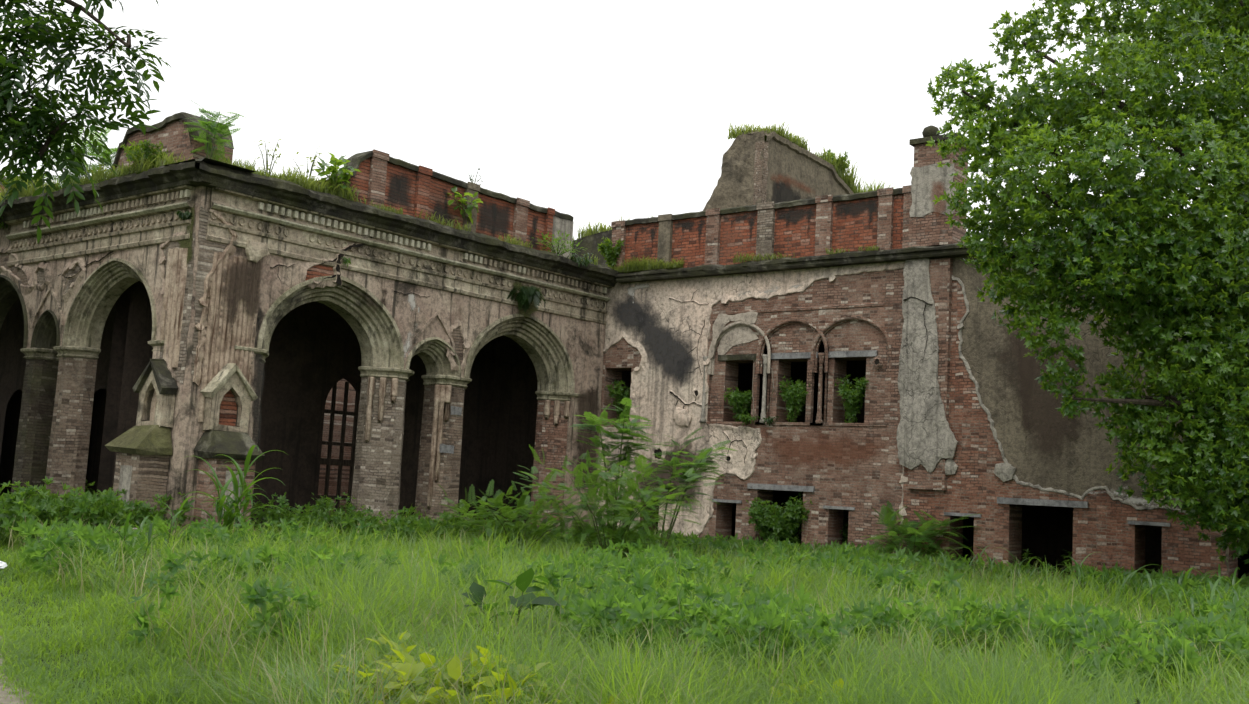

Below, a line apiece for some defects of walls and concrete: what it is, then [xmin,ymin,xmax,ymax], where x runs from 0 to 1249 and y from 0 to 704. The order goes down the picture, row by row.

water stain [218,261,264,447]
water stain [613,284,695,382]
peeling [659,261,1228,579]